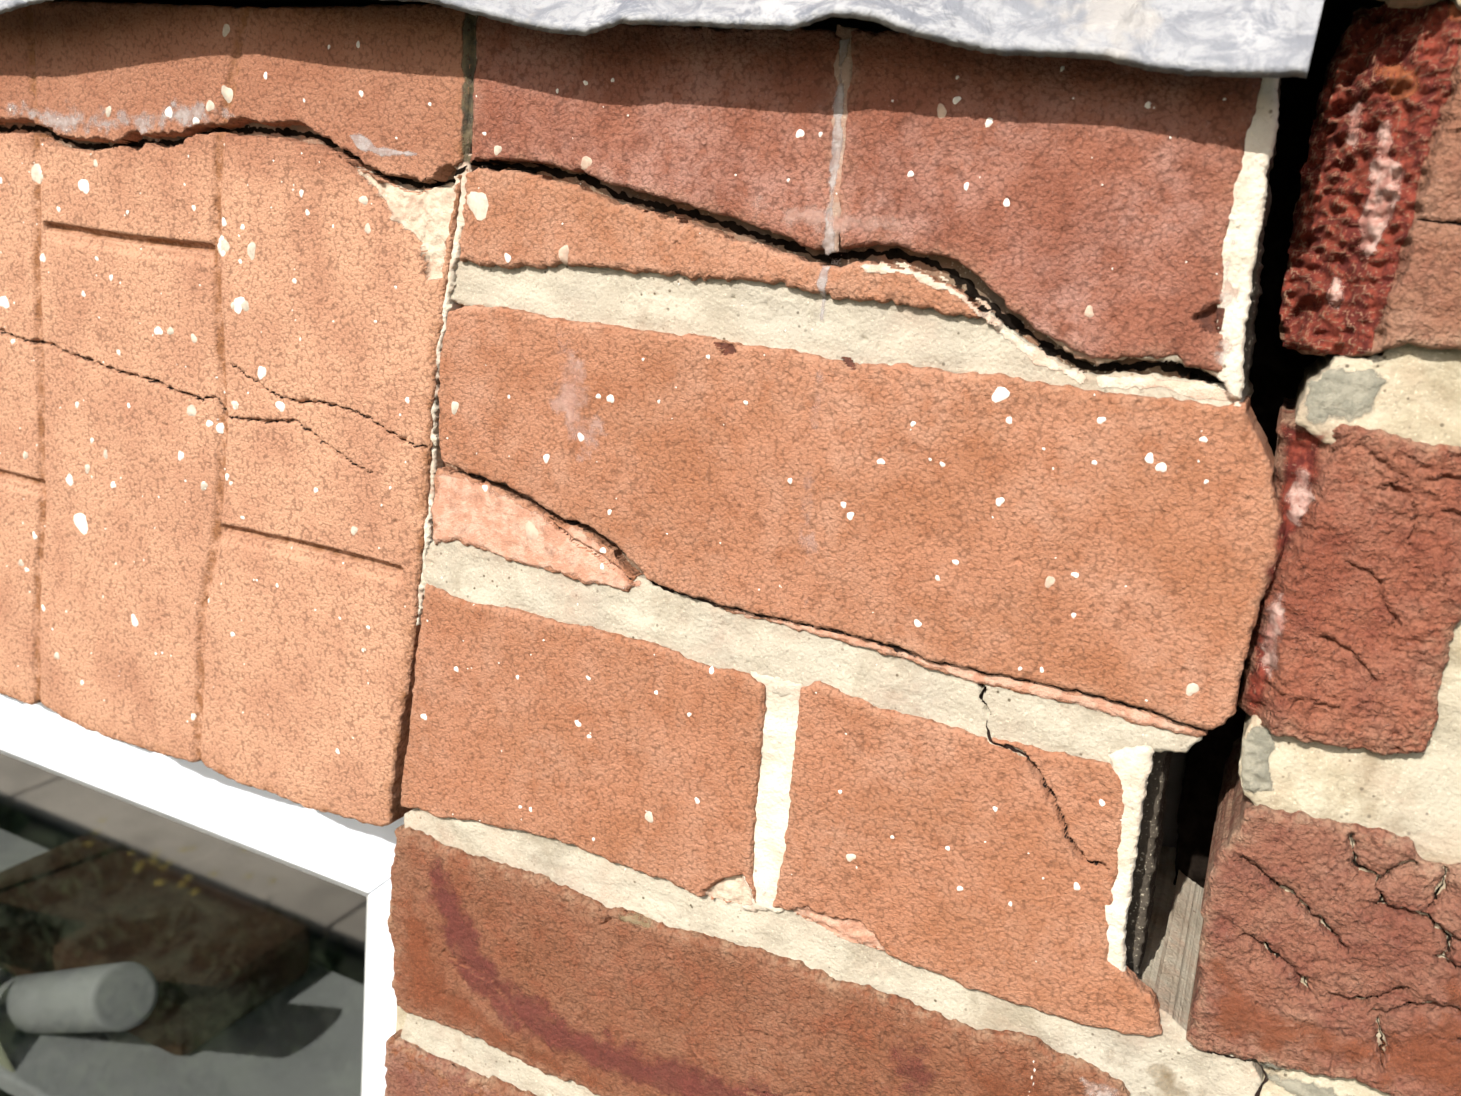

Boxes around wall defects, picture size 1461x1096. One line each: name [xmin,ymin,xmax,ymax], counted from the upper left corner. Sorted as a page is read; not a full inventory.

crack [0,40,1339,473]
crack [464,473,1246,888]
crack [1259,867,1338,935]
crack [1350,833,1456,969]
crack [1265,942,1308,986]
crack [1356,995,1412,1066]
crack [1190,1045,1269,1096]